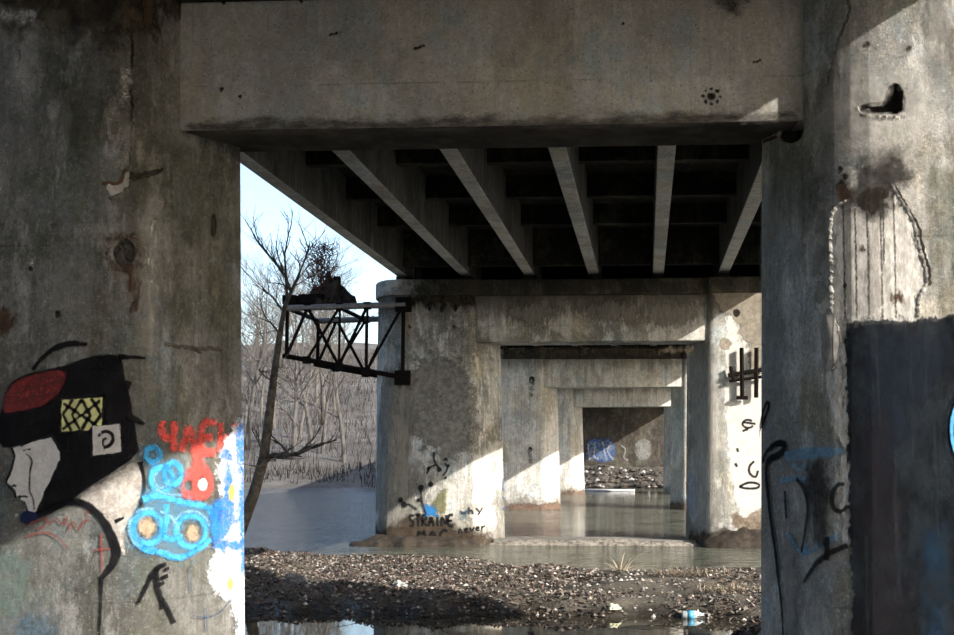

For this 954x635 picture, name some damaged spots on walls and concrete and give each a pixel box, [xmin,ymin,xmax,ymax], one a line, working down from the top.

crack [834,0,856,116]
spalling [854,82,921,132]
spalling [102,167,163,202]
rust [0,305,17,336]